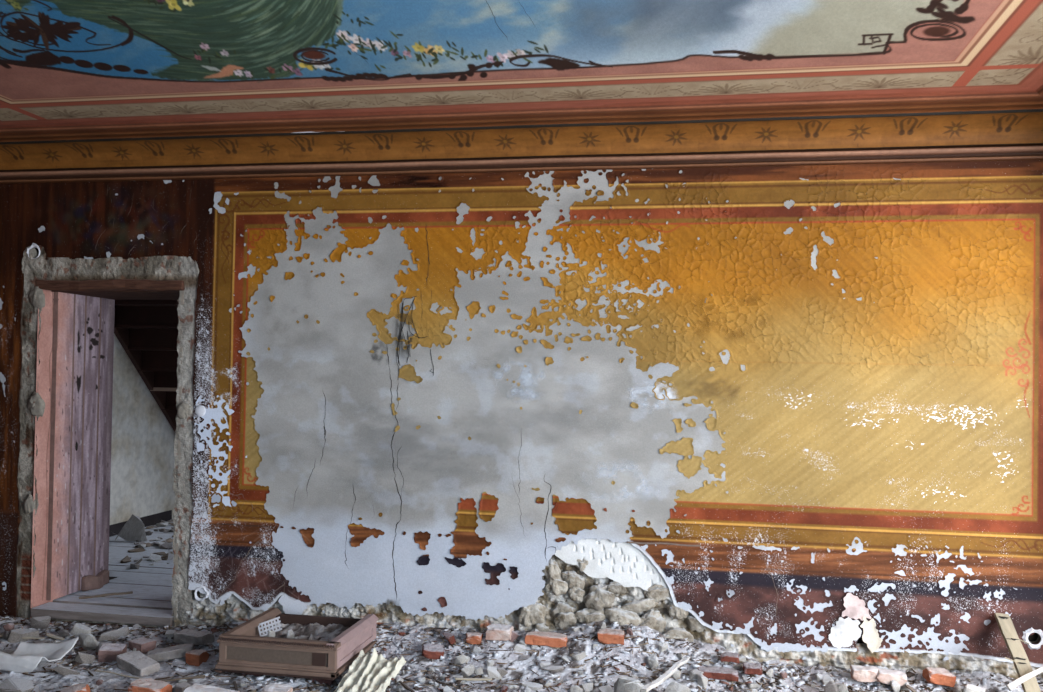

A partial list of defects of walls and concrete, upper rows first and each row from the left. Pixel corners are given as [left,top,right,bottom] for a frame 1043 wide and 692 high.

crack [294,393,326,499]
crack [345,344,404,600]
peeling [0,169,1025,679]
crack [512,428,556,562]
spalling [1022,627,1043,649]